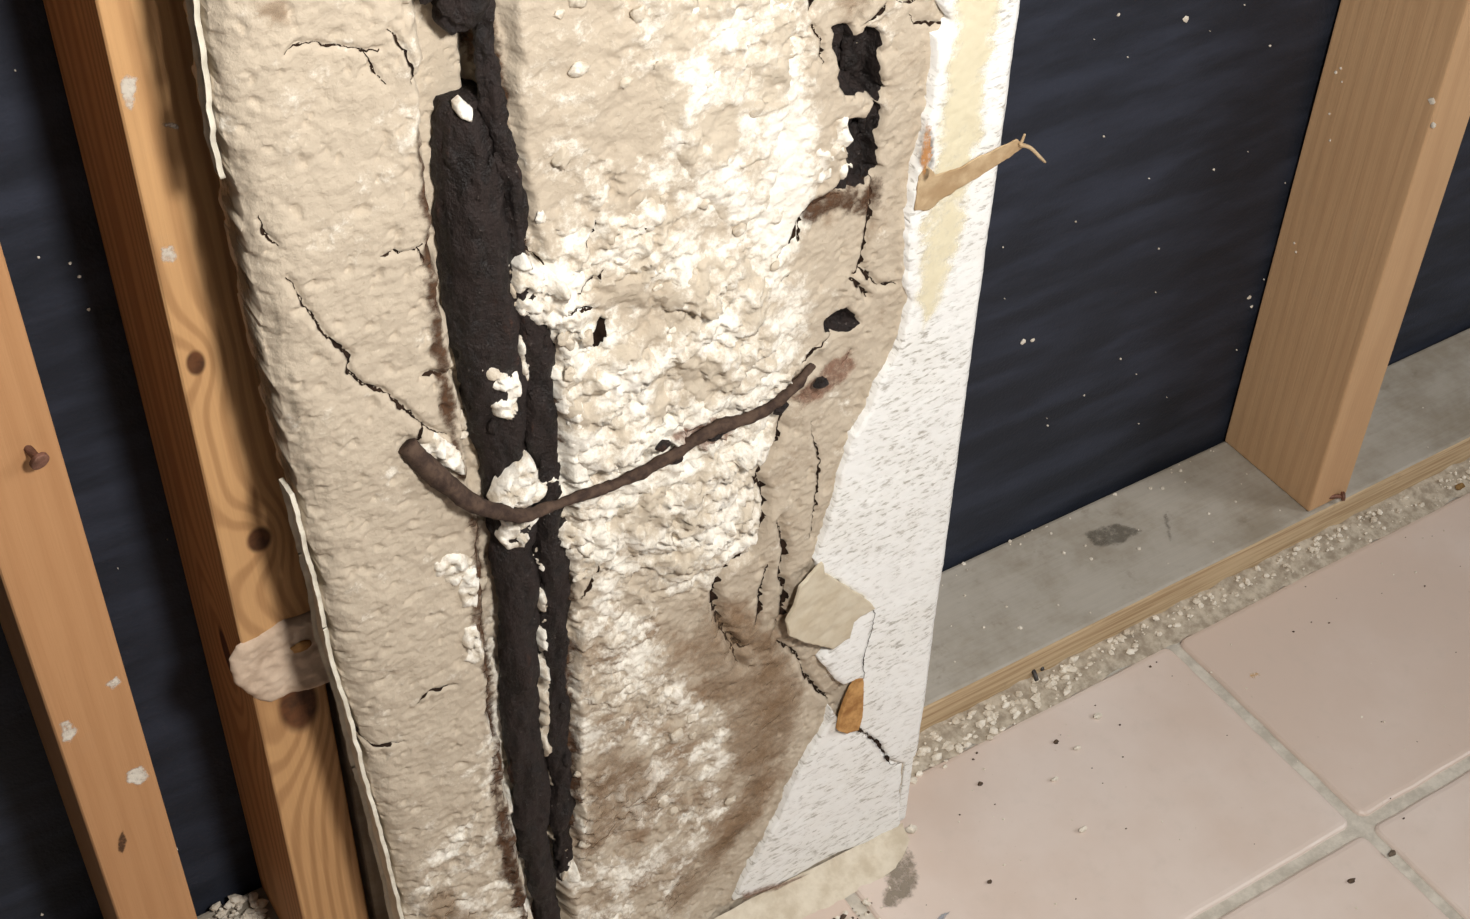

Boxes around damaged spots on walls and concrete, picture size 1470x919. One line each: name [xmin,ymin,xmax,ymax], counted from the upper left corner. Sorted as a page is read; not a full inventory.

crack [284,29,414,84]
crack [258,215,447,440]
spalling [183,0,1046,919]
crack [709,414,900,764]